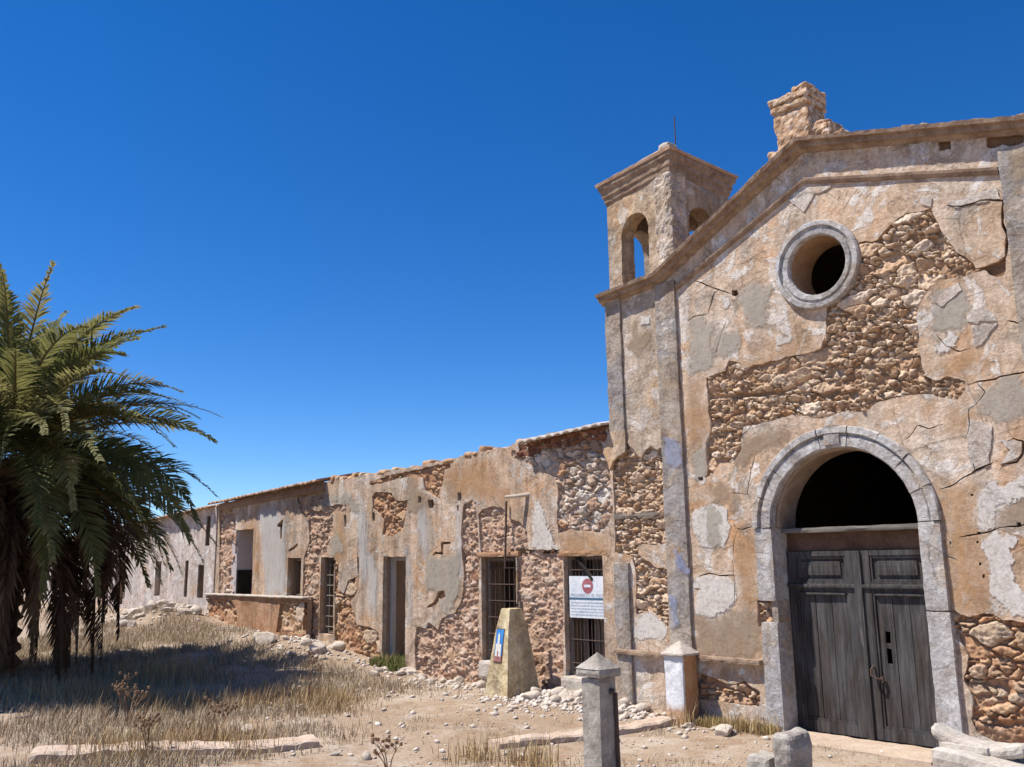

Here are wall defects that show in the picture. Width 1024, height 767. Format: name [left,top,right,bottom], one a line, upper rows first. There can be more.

crack [986,200,1008,259]
peeling [934,282,962,307]
crack [947,438,1024,488]